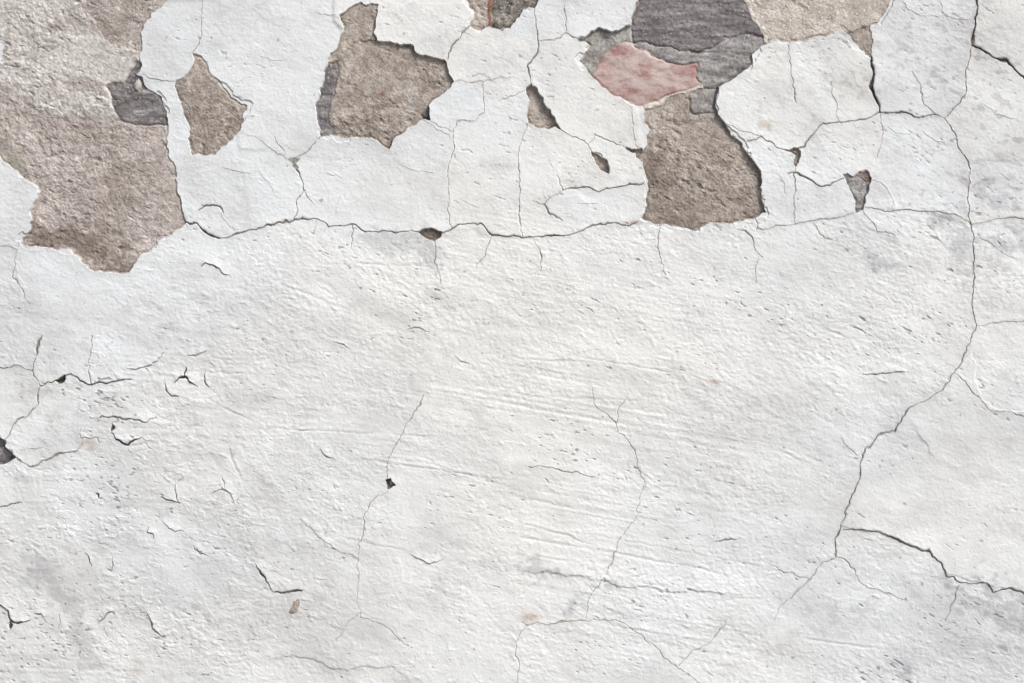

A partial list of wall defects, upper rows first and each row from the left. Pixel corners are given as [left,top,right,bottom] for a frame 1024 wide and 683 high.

crack [186,5,666,283]
peeling [0,0,1024,276]
crack [0,335,133,468]
crack [299,395,424,646]
crack [737,0,1024,621]